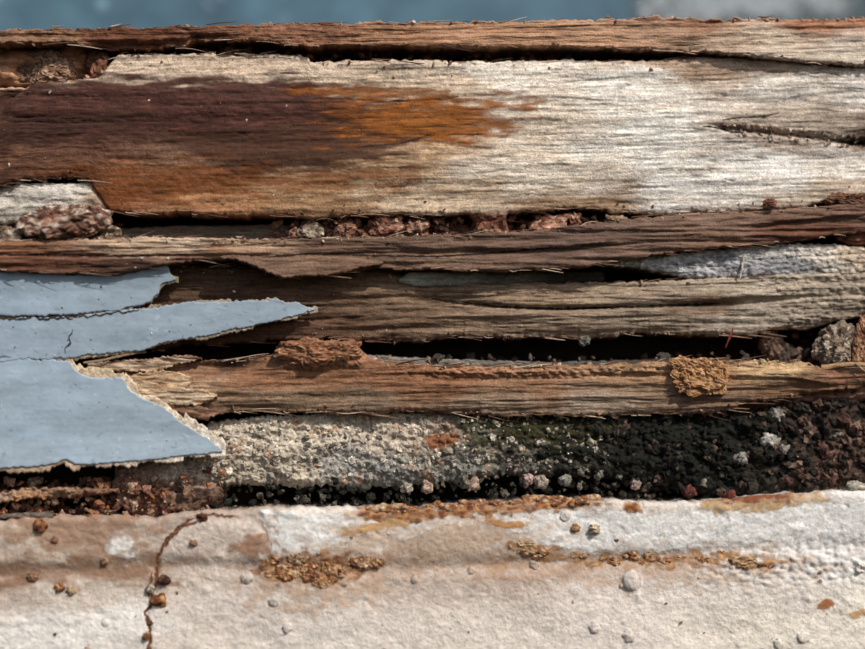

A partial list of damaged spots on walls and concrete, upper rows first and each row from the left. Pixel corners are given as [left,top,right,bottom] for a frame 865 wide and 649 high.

crack [704,113,778,133]
crack [845,140,865,148]
peeling [0,265,318,474]
water stain [460,406,798,497]
corrosion [342,494,604,536]
corrosion [624,501,643,513]
crack [142,512,272,649]
corrosion [229,533,387,589]
corrosion [497,538,789,572]